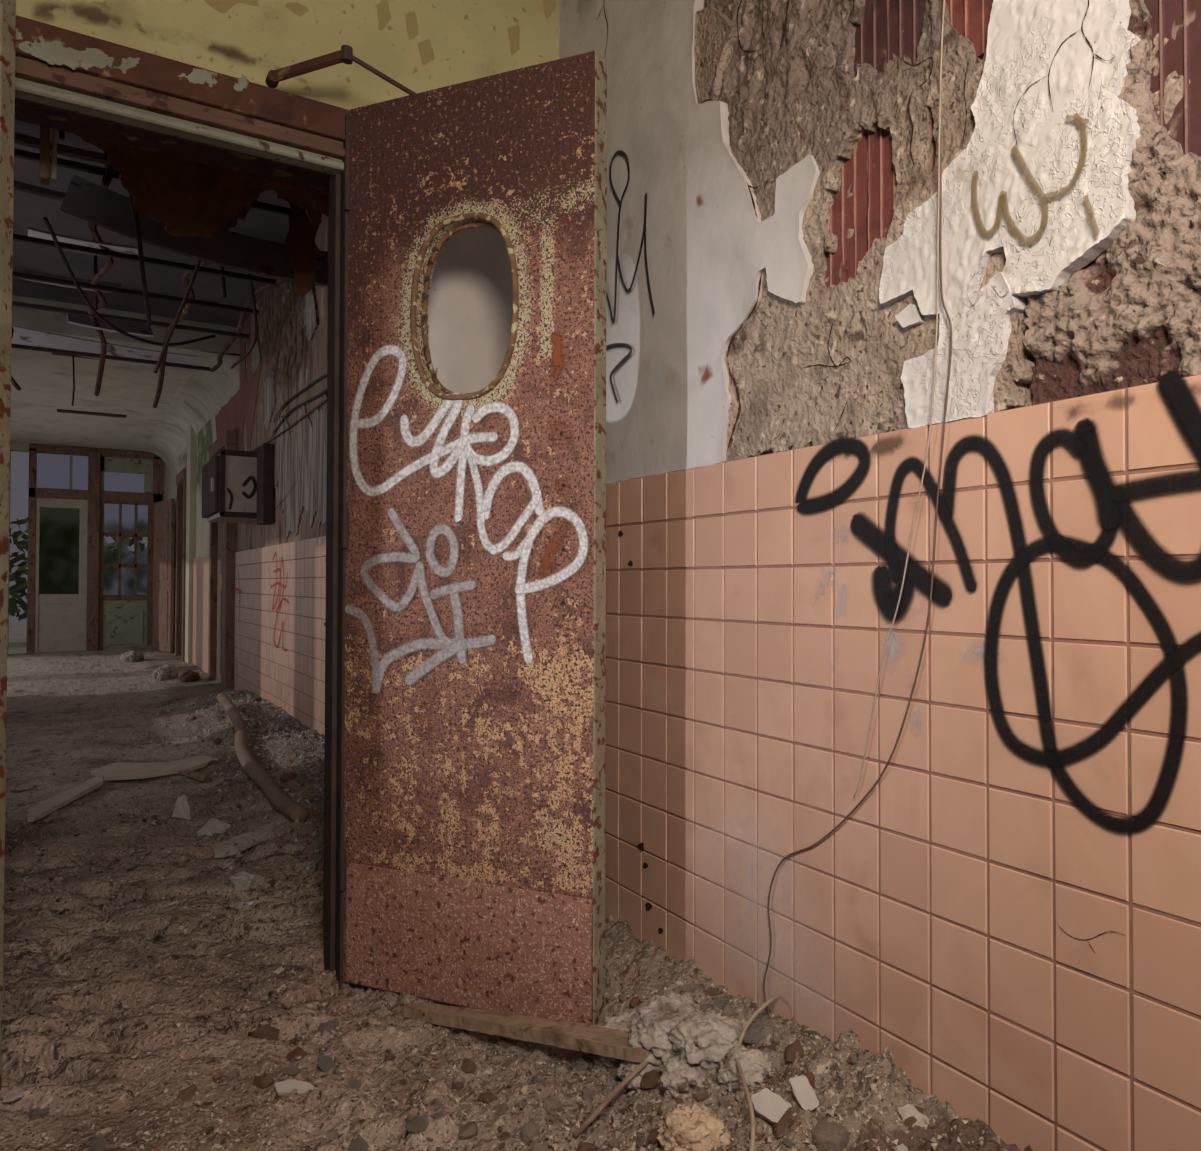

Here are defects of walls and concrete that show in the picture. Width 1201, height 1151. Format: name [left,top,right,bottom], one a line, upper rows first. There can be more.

peeling [205,0,259,13]
peeling [377,0,435,65]
flaking render [695,0,1201,462]
peeling [282,285,319,342]
peeling [215,326,327,538]